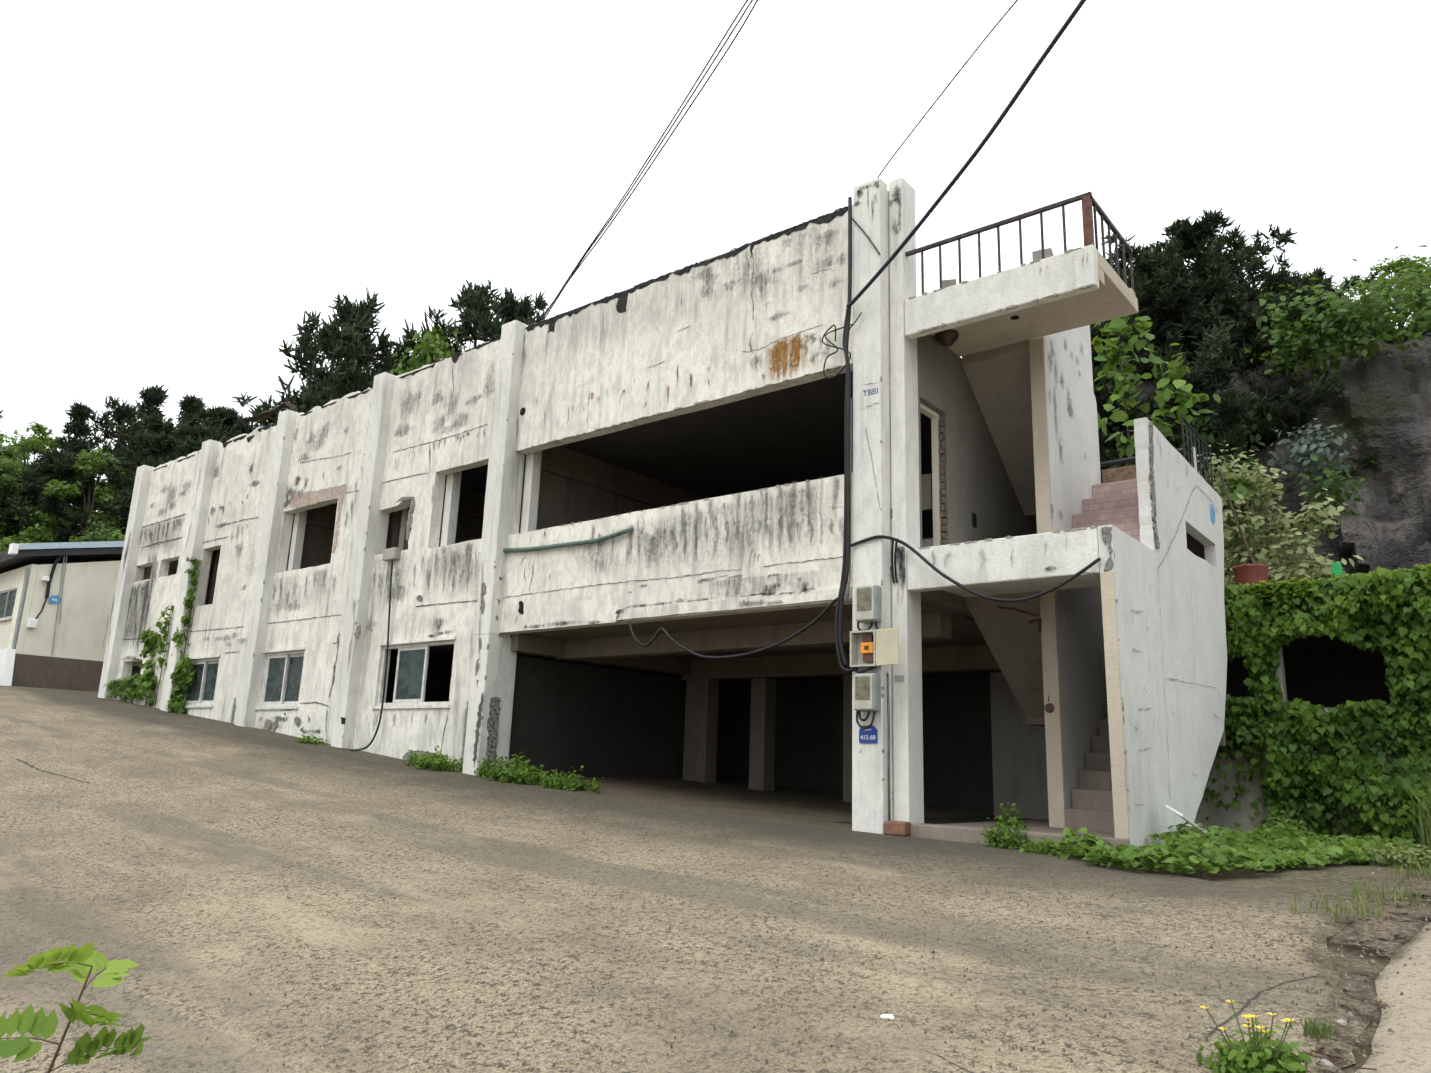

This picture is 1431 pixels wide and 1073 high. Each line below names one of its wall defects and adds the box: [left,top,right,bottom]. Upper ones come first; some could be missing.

water stain [698,268,732,294]
rust [763,333,801,379]
water stain [397,377,492,444]
water stain [284,425,328,507]
water stain [592,502,728,565]
water stain [743,480,844,605]